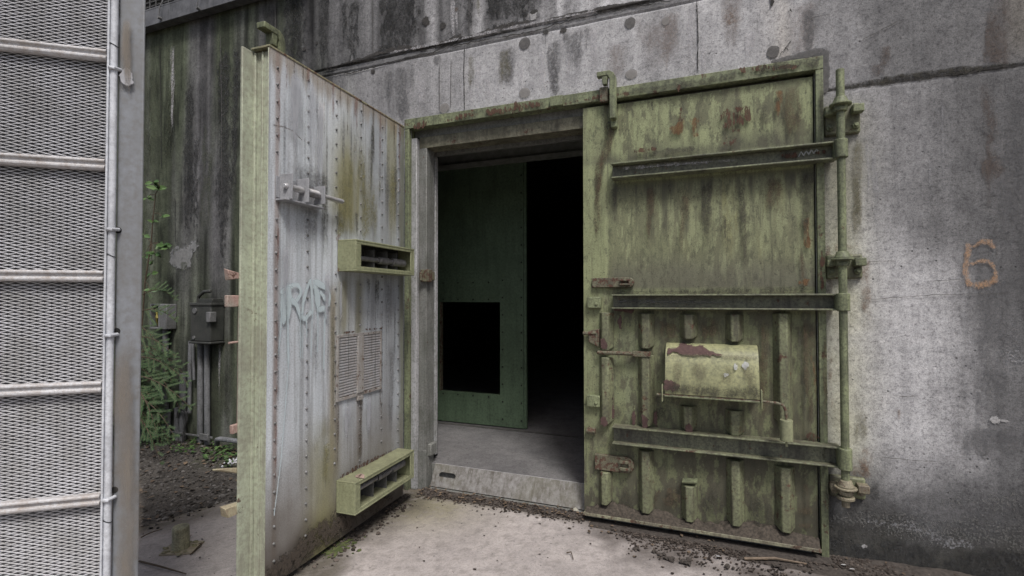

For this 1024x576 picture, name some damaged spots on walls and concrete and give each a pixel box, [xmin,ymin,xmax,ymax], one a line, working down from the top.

water stain [342,2,359,60]
water stain [379,0,420,52]
water stain [451,0,541,30]
water stain [172,52,199,242]
water stain [215,50,240,256]
corrosion [486,101,543,116]
corrosion [720,106,751,146]
peeling [169,240,199,271]